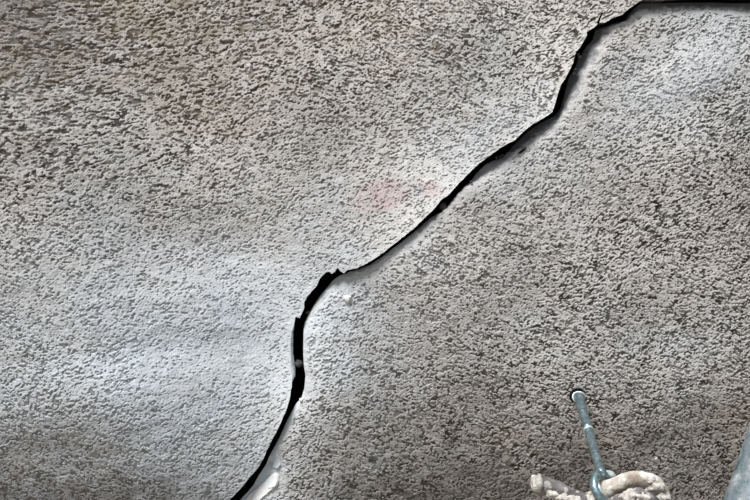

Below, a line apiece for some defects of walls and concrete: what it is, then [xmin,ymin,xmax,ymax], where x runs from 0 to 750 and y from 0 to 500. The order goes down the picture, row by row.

crack [230,0,750,500]